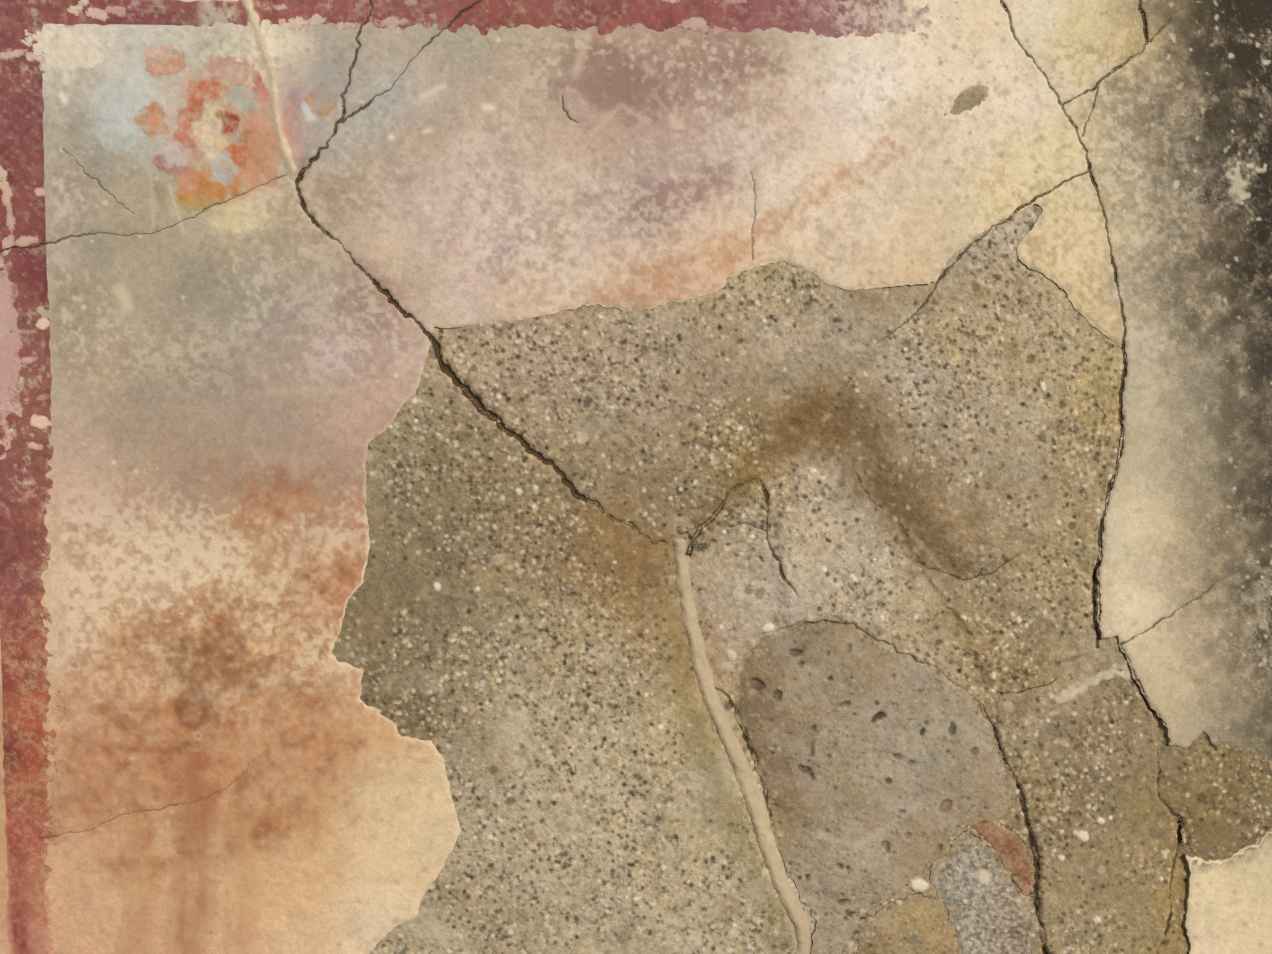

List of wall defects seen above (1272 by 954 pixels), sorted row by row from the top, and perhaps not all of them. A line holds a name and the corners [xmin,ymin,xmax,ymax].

crack [0,0,798,595]
damp [331,374,982,754]
crack [715,687,787,861]
spalling [369,204,1272,954]
crack [851,462,883,509]
crack [878,0,1252,954]